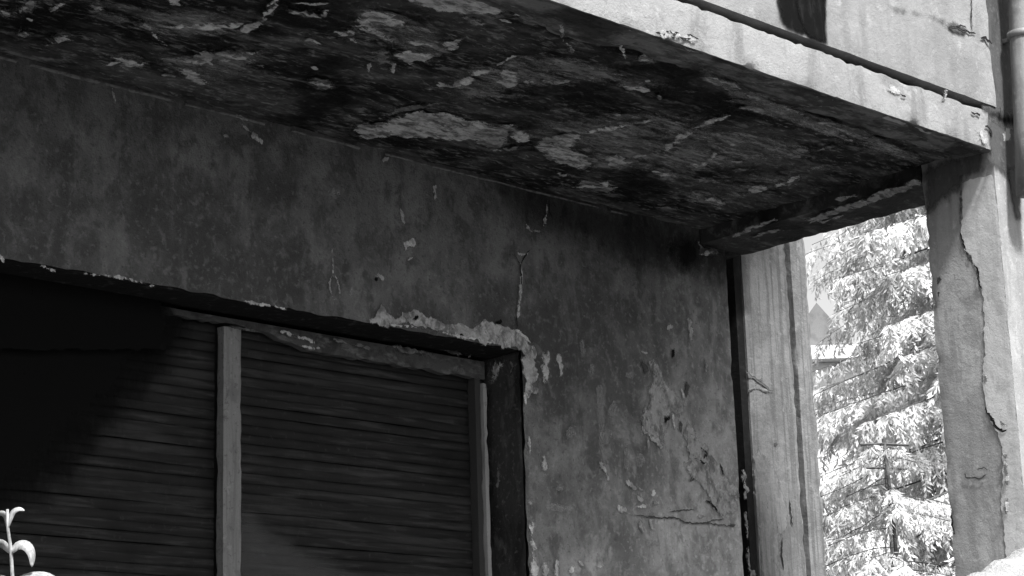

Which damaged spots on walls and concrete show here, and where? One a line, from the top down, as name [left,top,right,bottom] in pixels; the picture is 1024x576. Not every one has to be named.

peeling [89,0,278,85]
peeling [333,9,461,73]
peeling [436,24,662,100]
spalling [656,30,698,52]
leakage [777,0,827,43]
peeling [353,74,918,209]
spalling [803,179,921,224]
crack [514,198,552,329]
spalling [369,303,564,404]
crack [985,408,1007,432]
spalling [640,351,793,576]
crack [617,504,730,533]